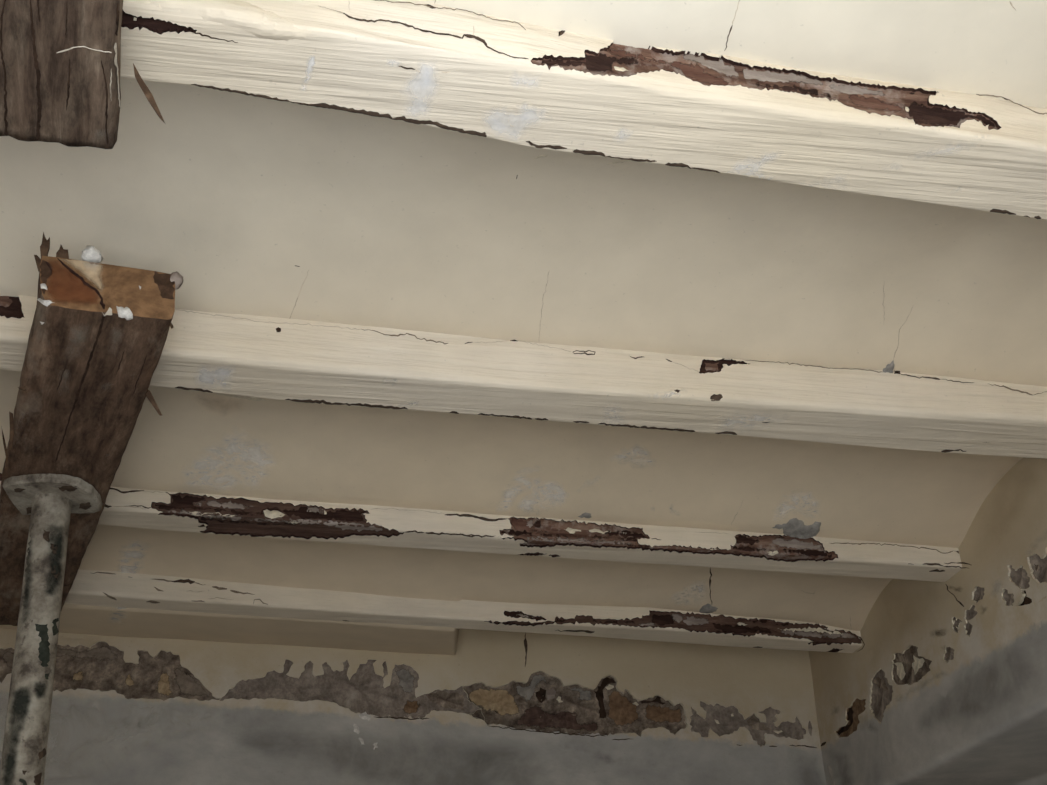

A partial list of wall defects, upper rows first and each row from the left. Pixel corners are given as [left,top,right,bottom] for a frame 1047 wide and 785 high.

peeling [121,10,197,35]
crack [319,0,528,59]
peeling [531,43,1002,130]
crack [976,94,1047,115]
peeling [699,358,747,374]
peeling [151,492,404,540]
peeling [499,516,838,562]
spalling [1001,542,1047,606]
peeling [484,610,861,652]
peeling [35,618,220,700]
spalling [594,677,616,718]
spalling [834,645,954,738]